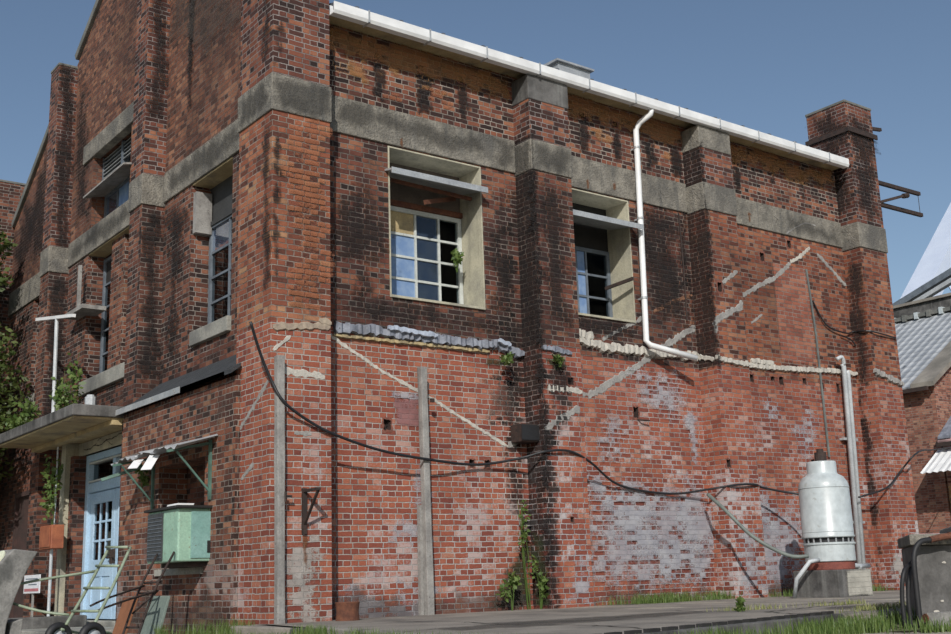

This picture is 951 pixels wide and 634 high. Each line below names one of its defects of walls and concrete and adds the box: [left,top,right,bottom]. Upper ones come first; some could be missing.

damp [186,0,195,110]
damp [329,26,510,119]
damp [494,156,714,609]